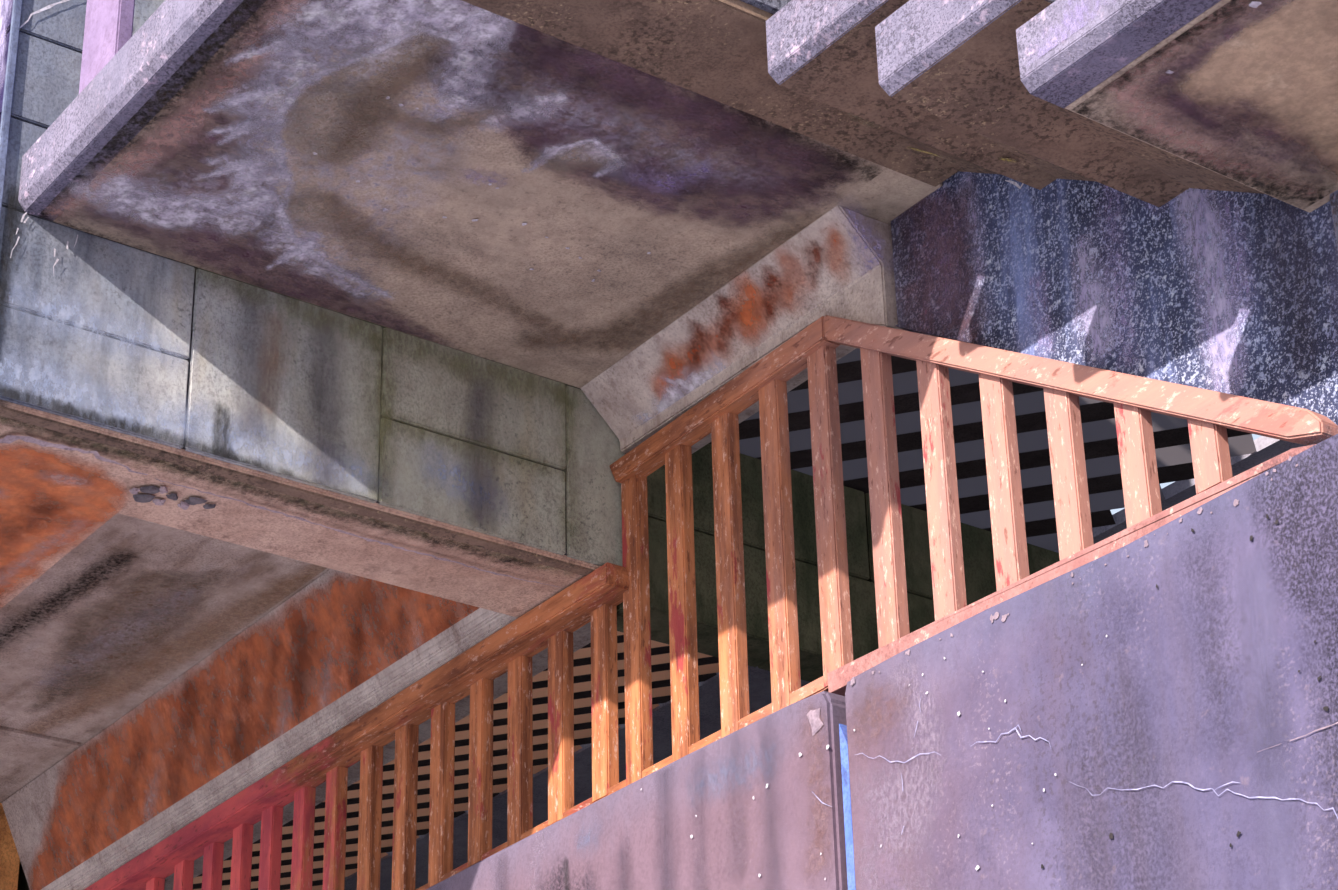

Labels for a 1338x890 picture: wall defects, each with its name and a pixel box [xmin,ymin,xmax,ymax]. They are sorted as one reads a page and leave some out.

leakage [0,0,9,55]
leakage [37,0,876,349]
leakage [1077,0,1338,206]
leakage [0,360,185,431]
rust [660,273,782,398]
rust [809,234,839,280]
leakage [1179,188,1249,381]
rust [0,446,123,597]
leakage [5,418,530,565]
rust [31,576,479,890]
crack [971,725,1051,747]
crack [1073,781,1338,819]